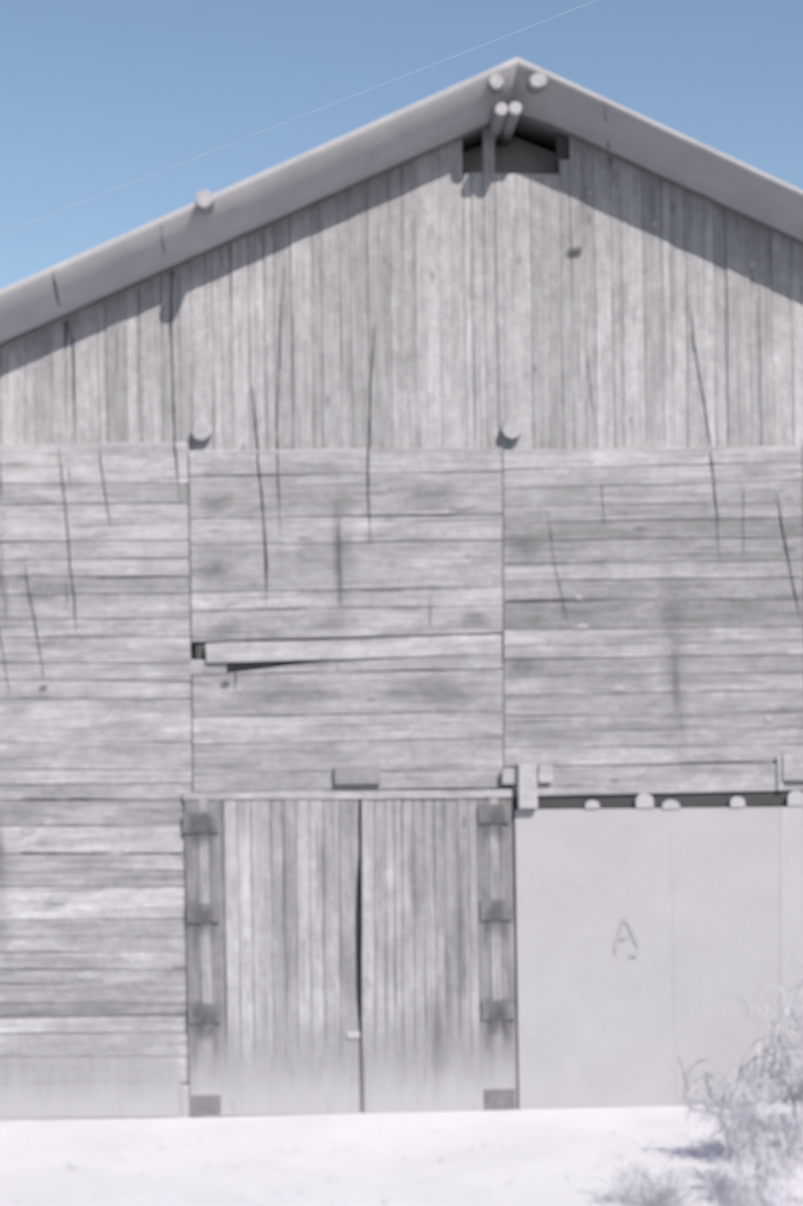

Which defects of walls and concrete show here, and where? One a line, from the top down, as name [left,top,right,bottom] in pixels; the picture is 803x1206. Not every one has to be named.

crack [0,534,43,692]
crack [53,274,77,634]
crack [99,450,111,523]
crack [251,261,295,608]
crack [367,327,375,545]
crack [690,305,744,563]
crack [776,493,802,621]